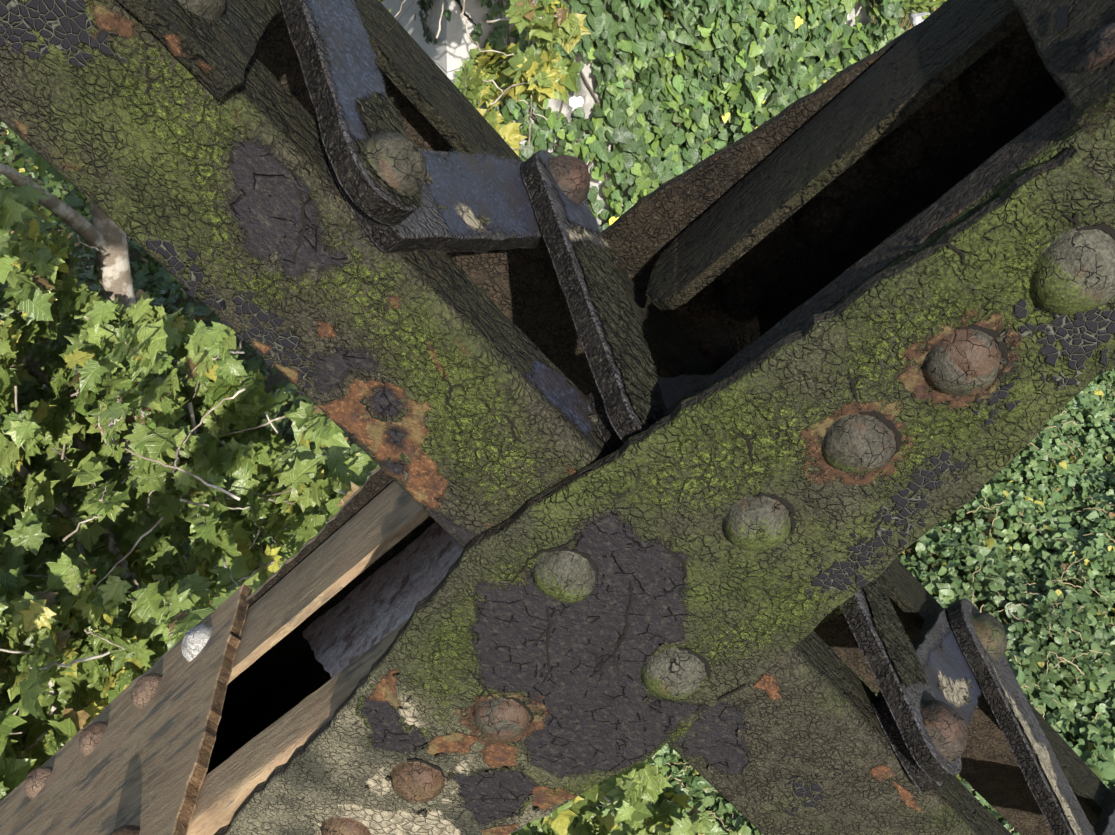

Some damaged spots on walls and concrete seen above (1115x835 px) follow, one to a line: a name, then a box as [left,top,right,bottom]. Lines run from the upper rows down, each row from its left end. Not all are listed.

rust [318,376,448,510]
rust [800,309,1023,486]
rust [369,670,403,710]
rust [422,692,549,774]
peeling [317,508,707,835]